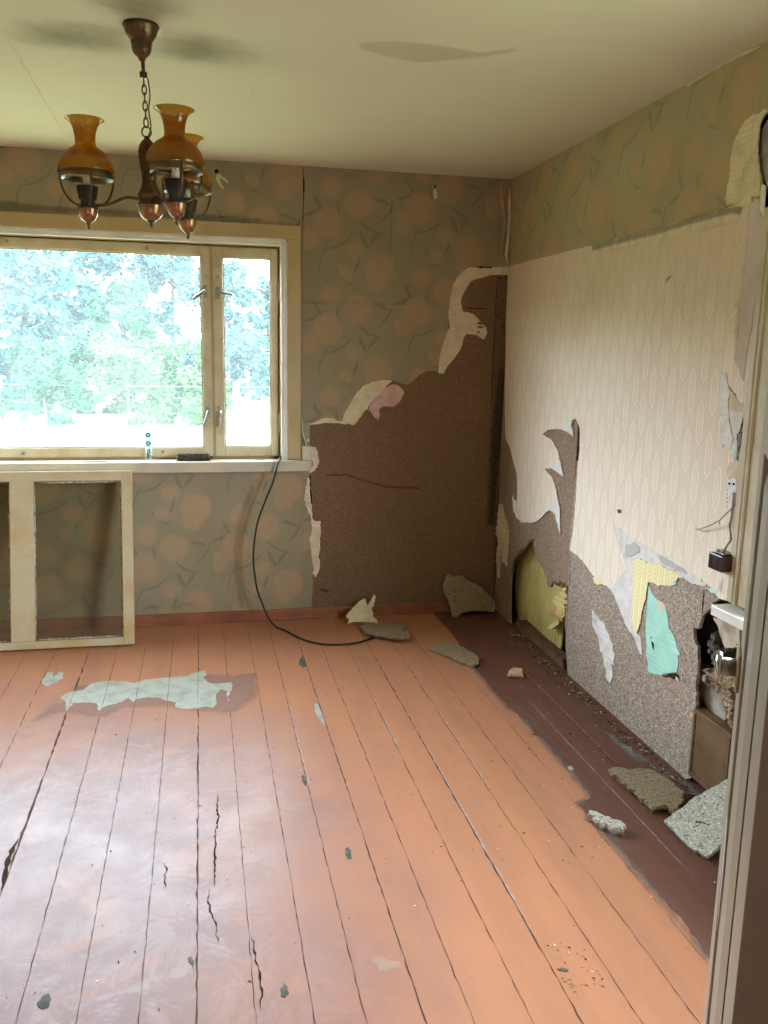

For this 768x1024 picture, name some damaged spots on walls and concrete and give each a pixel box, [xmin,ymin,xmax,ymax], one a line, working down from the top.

spalling [759,120,768,216]
spalling [730,432,742,462]
spalling [511,538,568,670]
peeling [48,671,253,714]
spalling [699,618,742,728]
crack [1,840,18,889]
crack [207,798,220,940]
crack [251,938,263,1009]